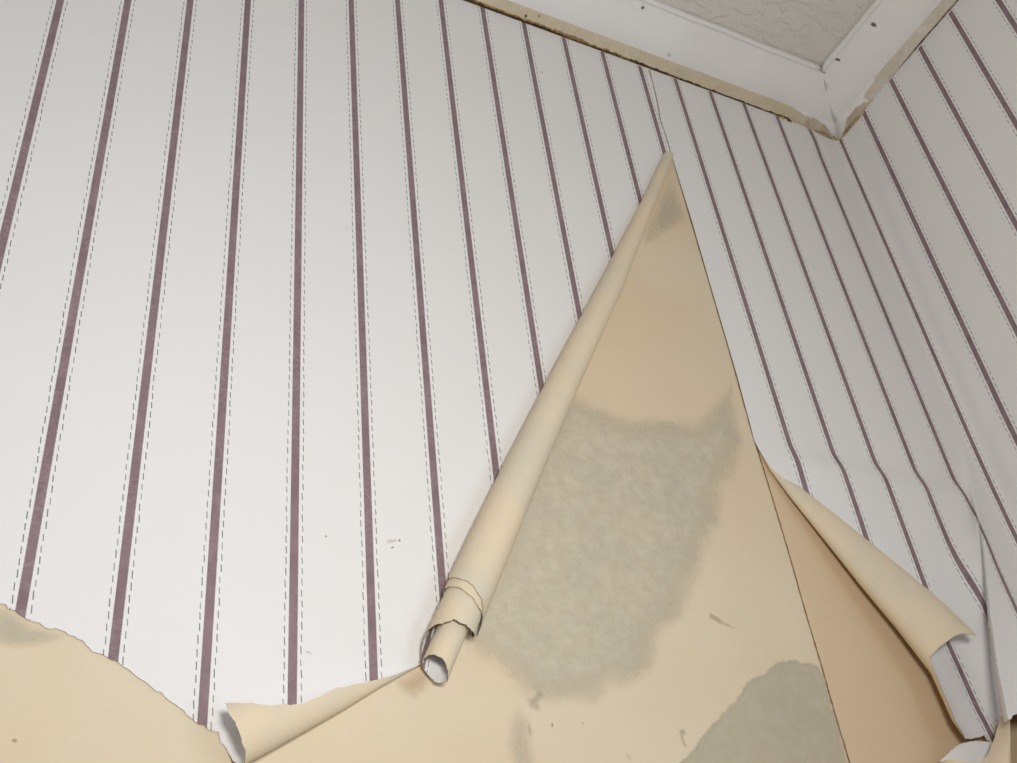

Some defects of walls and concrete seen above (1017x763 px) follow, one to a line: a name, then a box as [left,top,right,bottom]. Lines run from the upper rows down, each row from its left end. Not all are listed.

water stain [475,404,736,703]
flaking render [682,661,846,763]